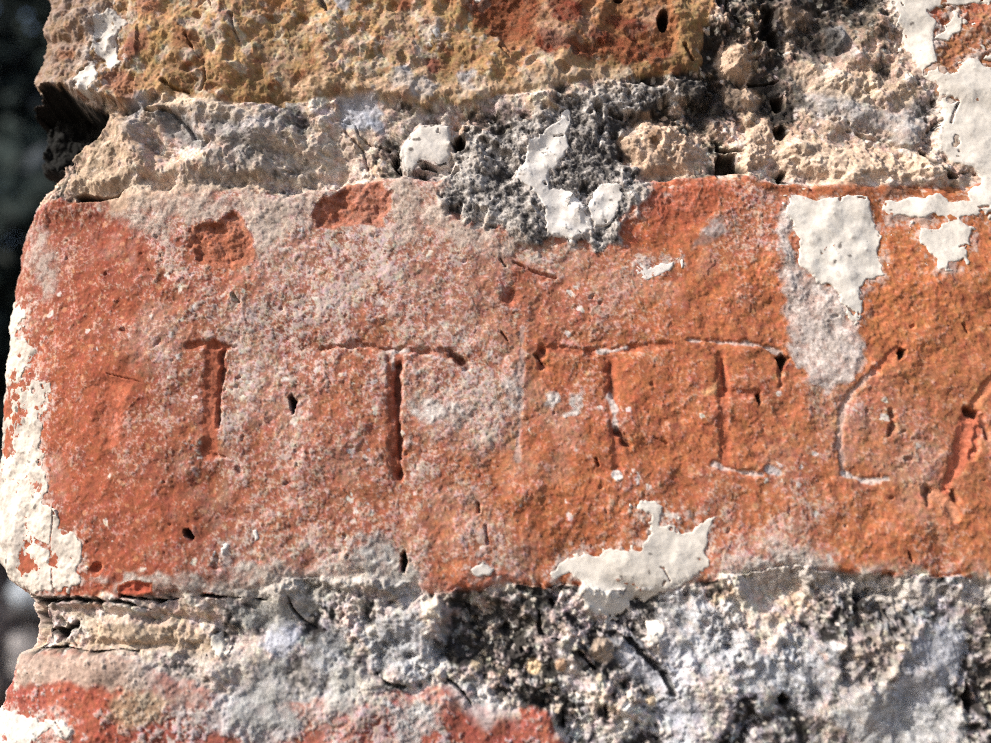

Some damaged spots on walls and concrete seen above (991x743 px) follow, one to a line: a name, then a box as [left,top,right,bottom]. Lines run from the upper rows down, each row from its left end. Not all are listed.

spalling [396,0,712,255]
peeling [715,0,991,325]
peeling [0,302,88,599]
peeling [550,500,716,623]
peeling [645,618,668,646]